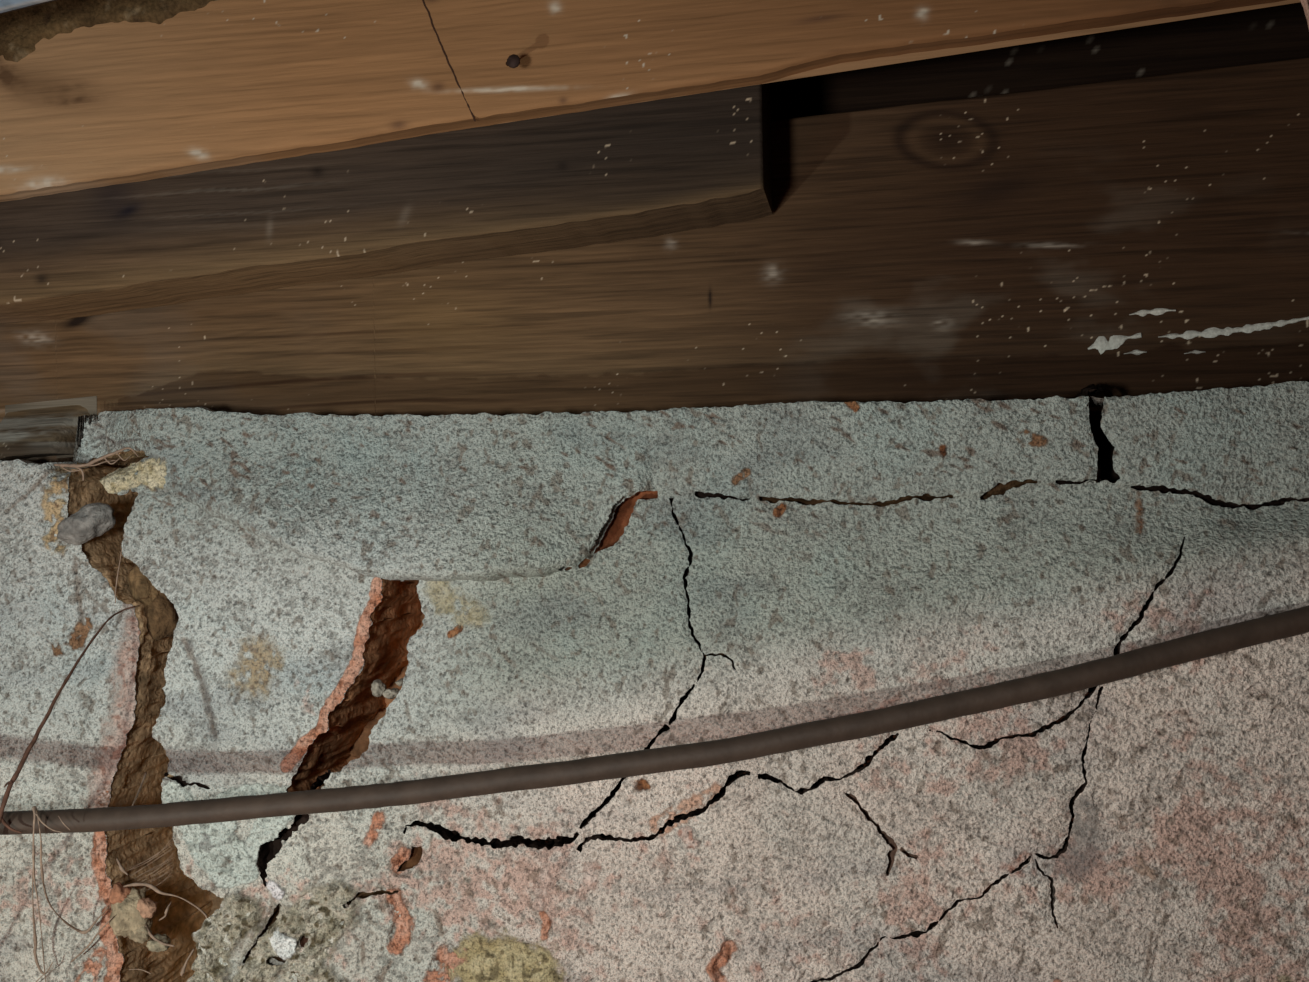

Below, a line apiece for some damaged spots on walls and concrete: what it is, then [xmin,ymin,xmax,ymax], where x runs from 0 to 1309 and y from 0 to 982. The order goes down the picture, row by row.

crack [67,449,223,982]
rust [231,642,280,693]
crack [257,577,425,887]
spalling [565,491,658,571]
crack [403,686,1103,982]
crack [644,384,1309,750]